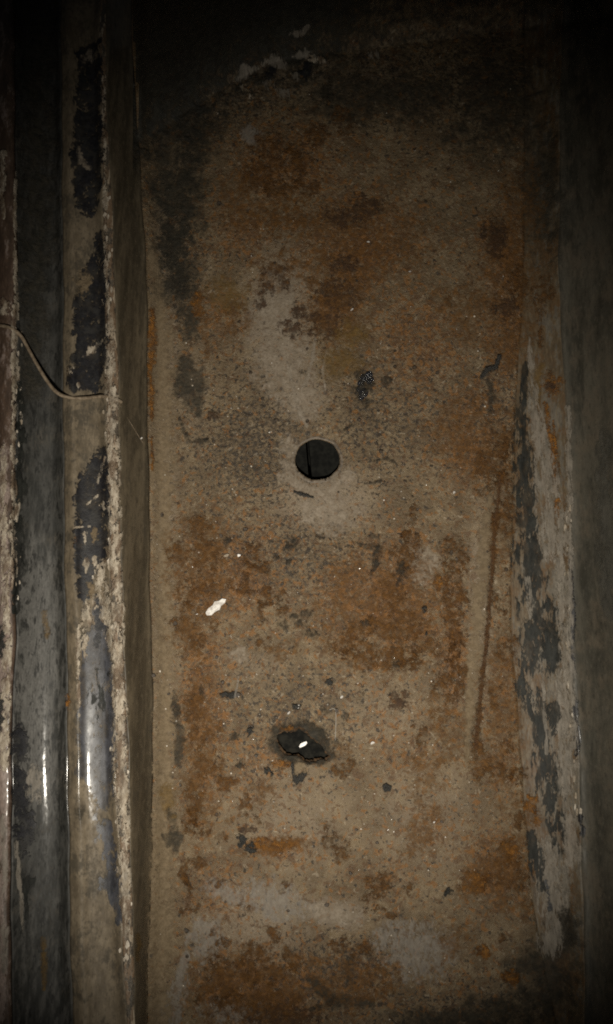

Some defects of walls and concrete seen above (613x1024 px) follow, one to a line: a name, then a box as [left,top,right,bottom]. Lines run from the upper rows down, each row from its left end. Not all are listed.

corrosion [254,263,290,309]
corrosion [276,254,361,344]
peeling [66,38,133,961]
corrosion [165,514,289,650]
corrosion [387,686,408,710]
corrosion [328,502,470,703]
corrosion [459,427,542,895]
peeling [510,338,586,958]
corrosion [181,688,300,856]
corrosion [178,857,208,913]
corrosion [193,923,328,1024]